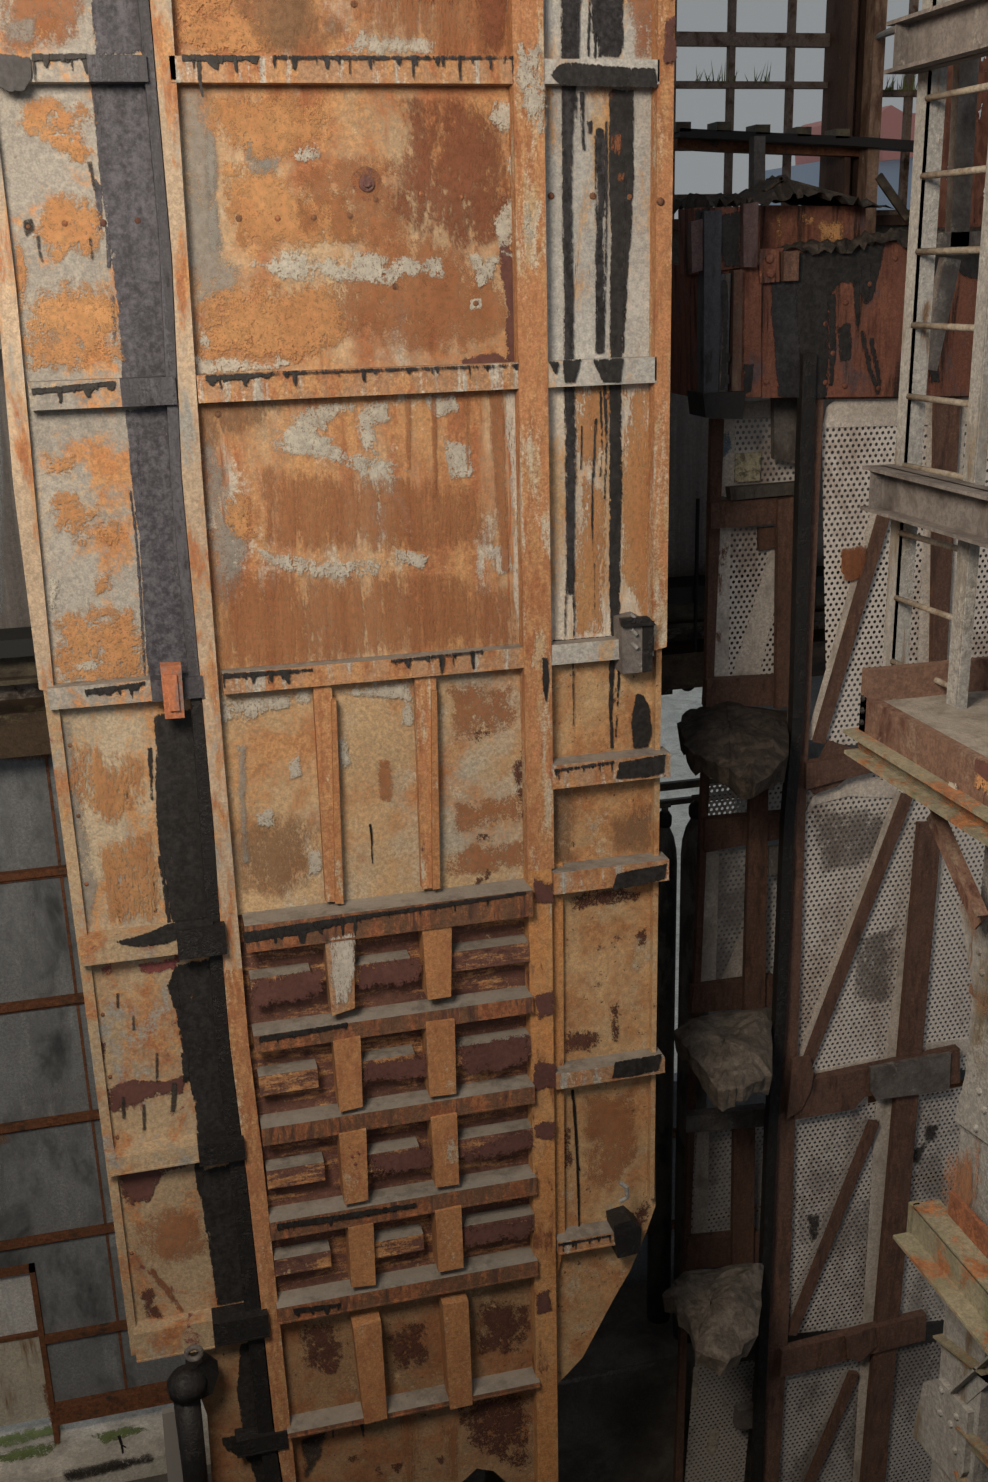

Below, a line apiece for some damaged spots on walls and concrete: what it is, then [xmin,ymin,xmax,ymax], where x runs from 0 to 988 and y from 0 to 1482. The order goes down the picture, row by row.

corrosion [176,0,275,54]
corrosion [516,41,547,133]
corrosion [20,97,93,163]
corrosion [195,94,534,364]
corrosion [803,214,844,242]
corrosion [15,191,123,372]
peeling [425,393,459,417]
peeling [262,401,401,497]
peeling [444,438,475,479]
corrosion [488,390,509,572]
corrosion [447,684,517,742]
corrosion [447,796,523,875]